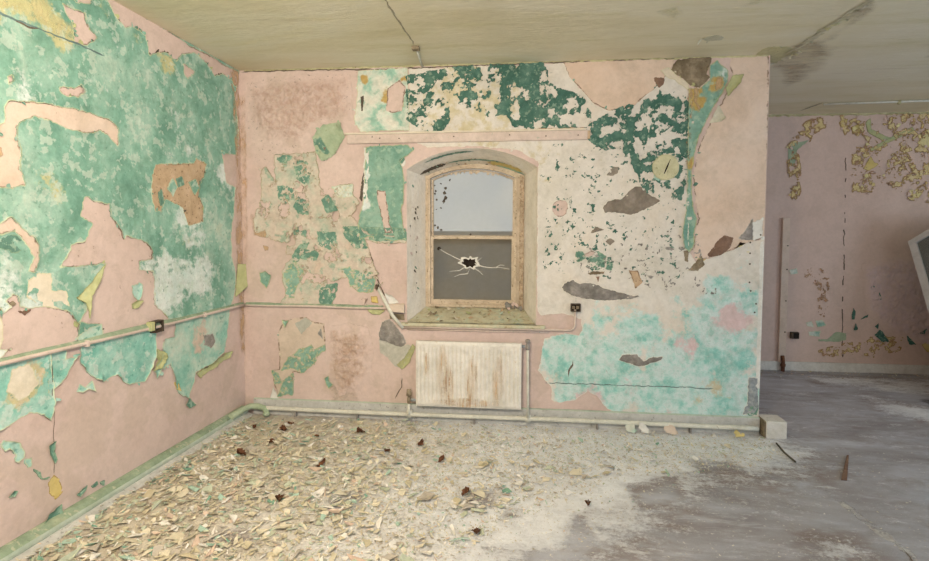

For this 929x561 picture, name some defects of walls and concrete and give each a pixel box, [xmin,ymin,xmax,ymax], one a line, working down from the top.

crack [0,12,104,56]
crack [385,0,414,43]
crack [785,0,875,55]
crack [244,58,690,72]
peeling [787,117,826,200]
peeling [839,113,929,203]
peeling [0,0,248,523]
crack [440,249,507,277]
peeling [253,47,802,433]
peeling [804,268,830,317]
peeling [818,323,929,358]